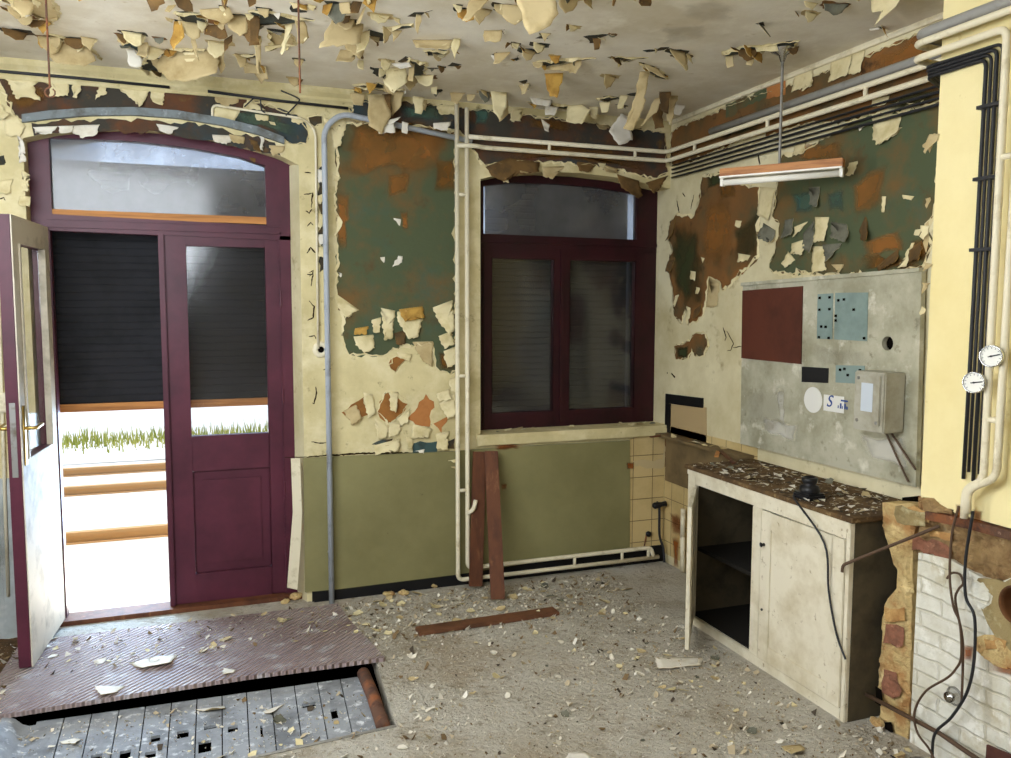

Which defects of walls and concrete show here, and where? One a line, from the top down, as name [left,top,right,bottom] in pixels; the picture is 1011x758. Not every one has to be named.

peeling [0,0,940,469]
spalling [861,491,1011,758]